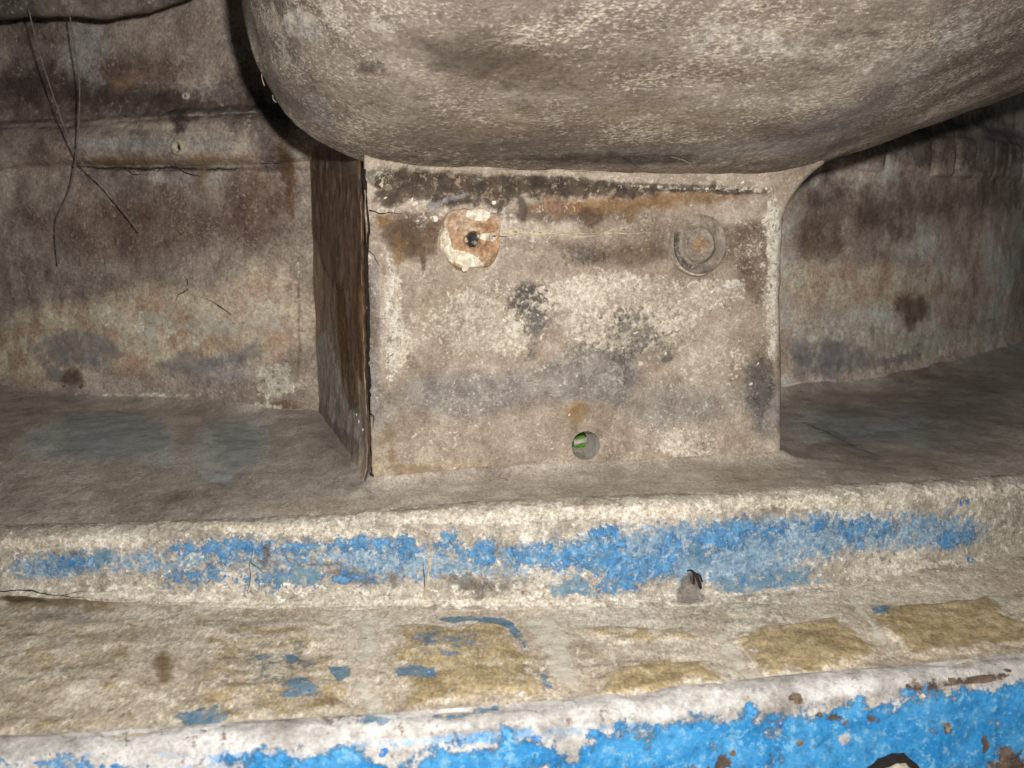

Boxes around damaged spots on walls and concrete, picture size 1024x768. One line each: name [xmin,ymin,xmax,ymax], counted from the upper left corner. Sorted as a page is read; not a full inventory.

damp [267,3,313,36]
damp [7,76,259,133]
crack [71,166,238,177]
damp [375,167,723,220]
corrosion [580,195,657,227]
corrosion [379,217,437,269]
damp [792,300,1023,381]
peeling [157,531,421,597]
peeling [434,513,894,605]
peeling [440,616,526,648]
peeling [175,705,227,725]
peeling [219,665,1024,768]